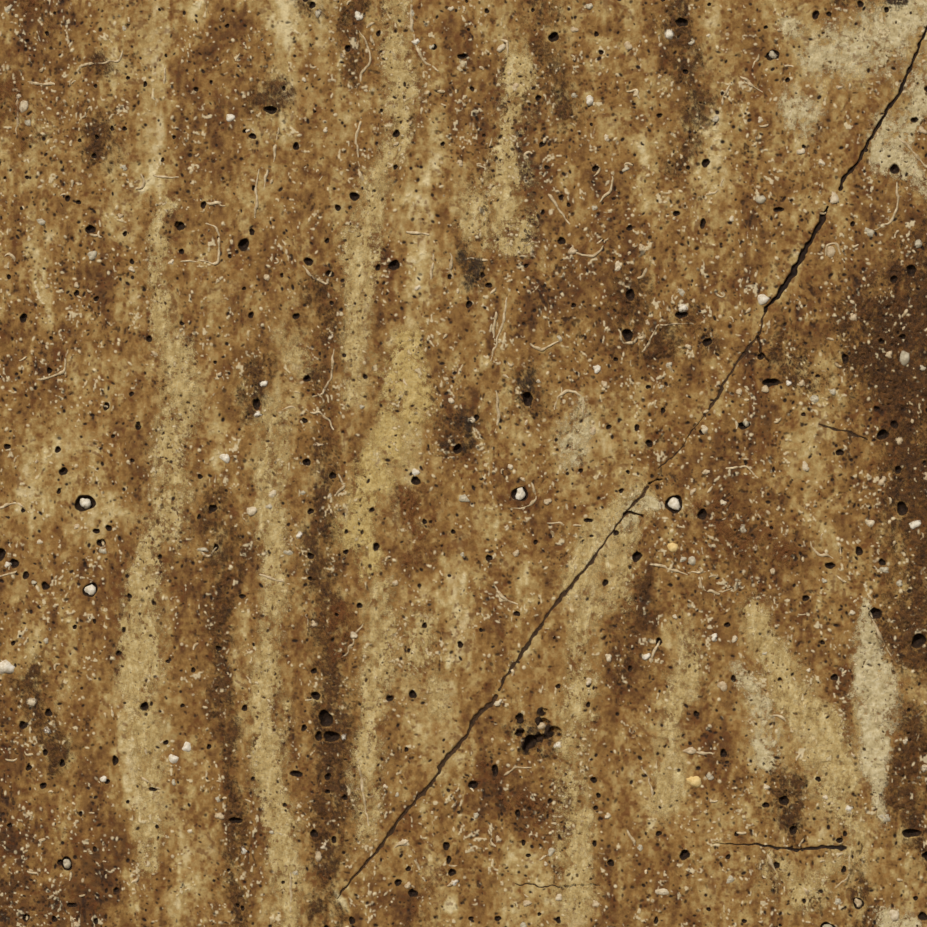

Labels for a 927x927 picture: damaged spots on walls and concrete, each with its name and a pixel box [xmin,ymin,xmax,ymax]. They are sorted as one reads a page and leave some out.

damp [452,38,574,291]
damp [656,0,717,177]
damp [781,17,808,40]
damp [778,87,821,138]
damp [798,0,927,197]
damp [113,0,480,927]
damp [557,396,591,469]
crack [337,26,927,899]
damp [732,209,927,927]
damp [11,654,72,774]
damp [504,482,666,925]
damp [651,620,703,821]